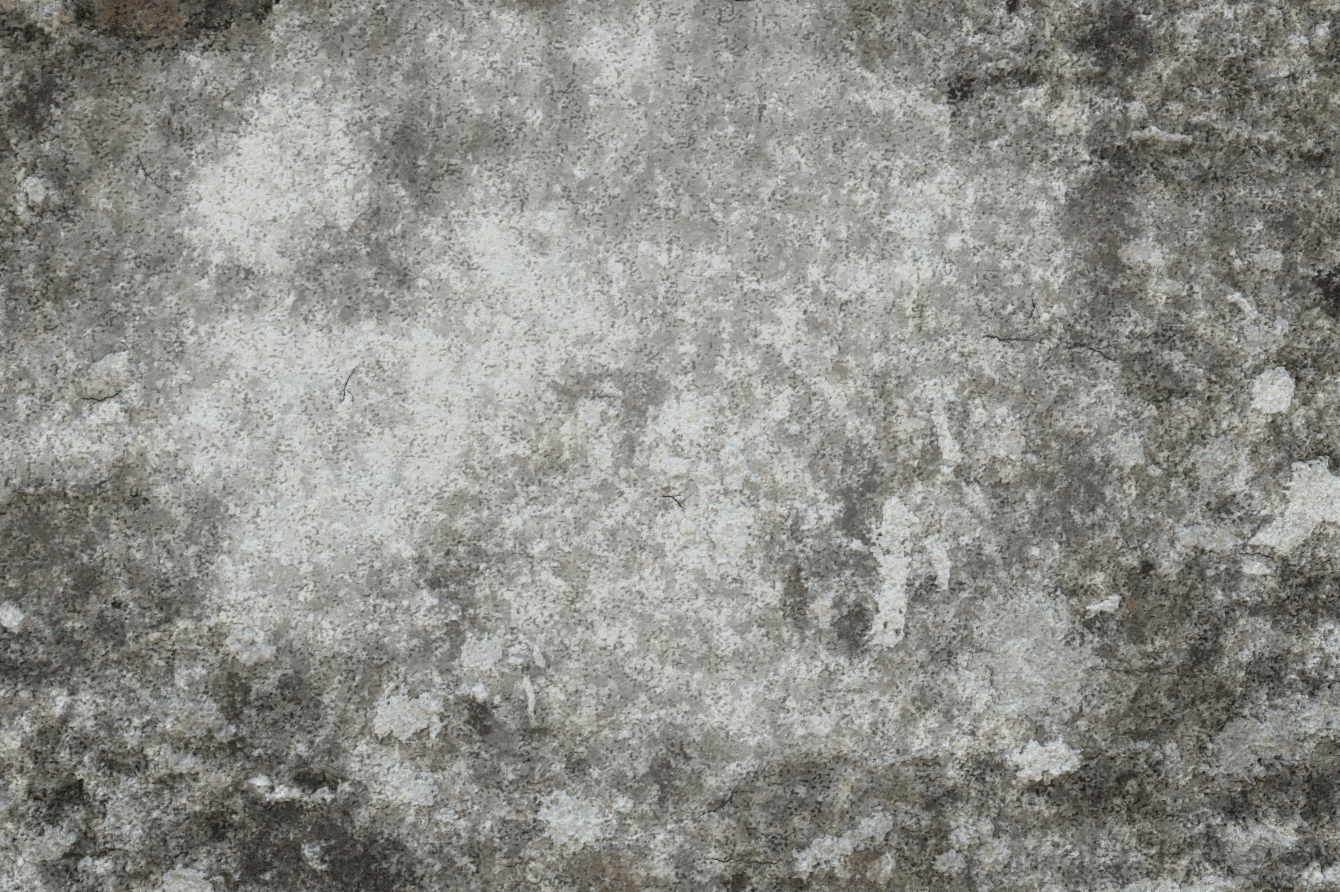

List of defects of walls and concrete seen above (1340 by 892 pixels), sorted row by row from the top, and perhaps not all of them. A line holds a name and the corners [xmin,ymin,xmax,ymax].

flaking render [0,320,134,640]
spalling [15,762,93,870]
flaking render [157,861,225,892]
flaking render [300,841,329,872]
spalling [283,761,347,792]
flaking render [372,691,459,824]